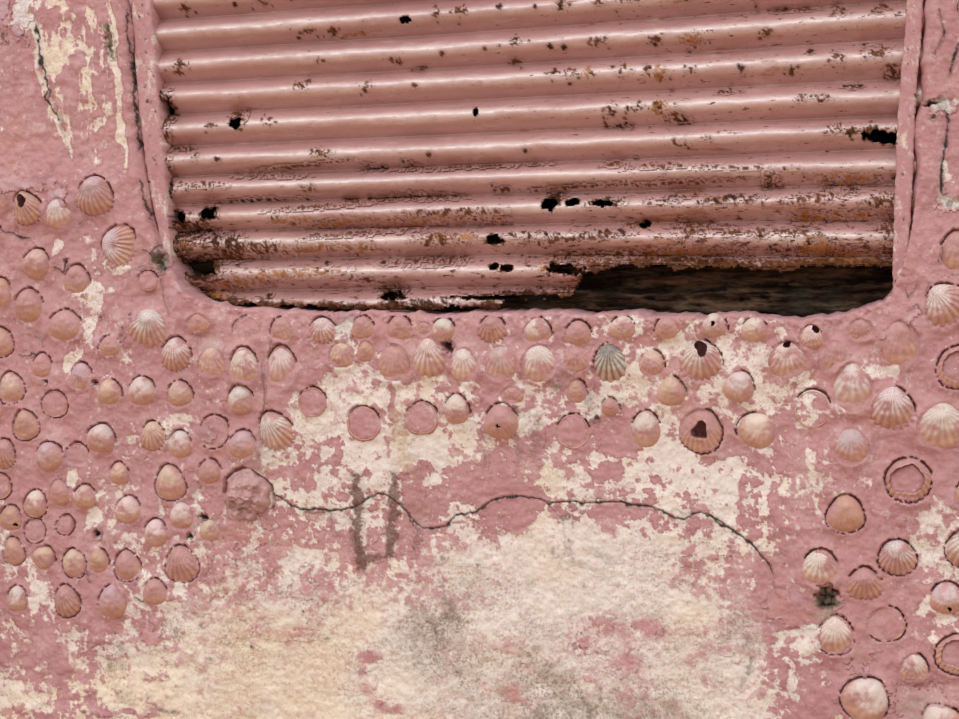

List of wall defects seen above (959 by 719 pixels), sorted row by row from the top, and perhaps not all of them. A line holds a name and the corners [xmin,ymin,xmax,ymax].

crack [33,19,83,158]
peeling [1,0,146,242]
corrosion [287,23,393,41]
corrosion [159,56,898,311]
corrosion [600,27,714,150]
corrosion [751,0,860,19]
corrosion [859,43,902,83]
spalling [921,93,959,138]
spalling [921,151,959,234]
crack [931,0,959,77]
crack [938,111,953,194]
crack [265,467,777,590]